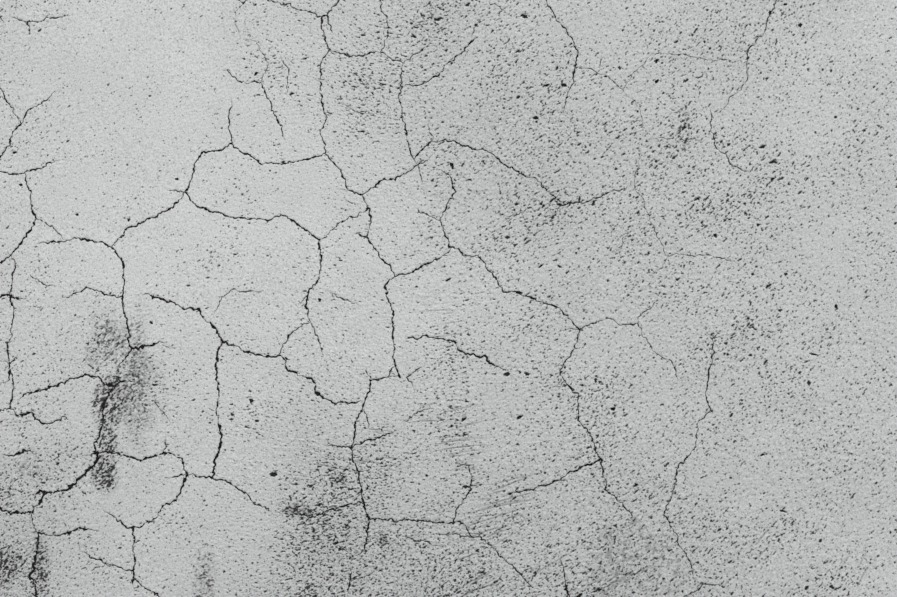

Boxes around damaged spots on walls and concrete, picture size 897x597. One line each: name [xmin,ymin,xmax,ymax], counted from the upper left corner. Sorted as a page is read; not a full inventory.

crack [546,0,777,172]
crack [0,0,679,597]
crack [533,167,731,274]
crack [663,333,720,597]